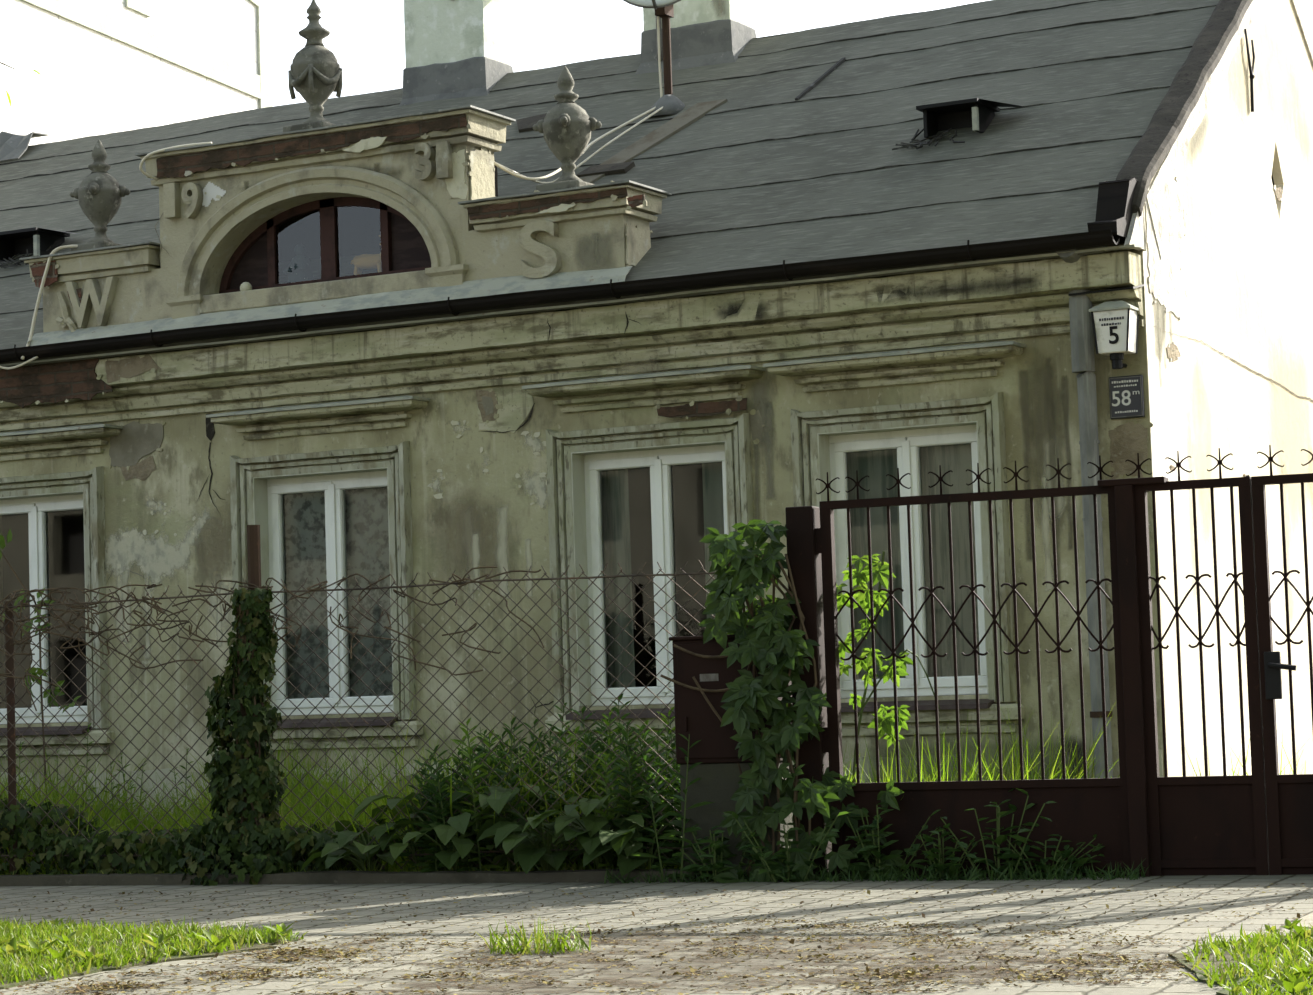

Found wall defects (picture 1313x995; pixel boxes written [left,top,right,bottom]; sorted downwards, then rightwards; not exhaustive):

leakage [1191,119,1206,153]
leakage [1154,298,1173,387]
spalling [204,413,215,442]
spalling [654,395,747,419]
peeling [105,498,210,588]
leakage [464,512,480,598]
leakage [498,507,508,596]